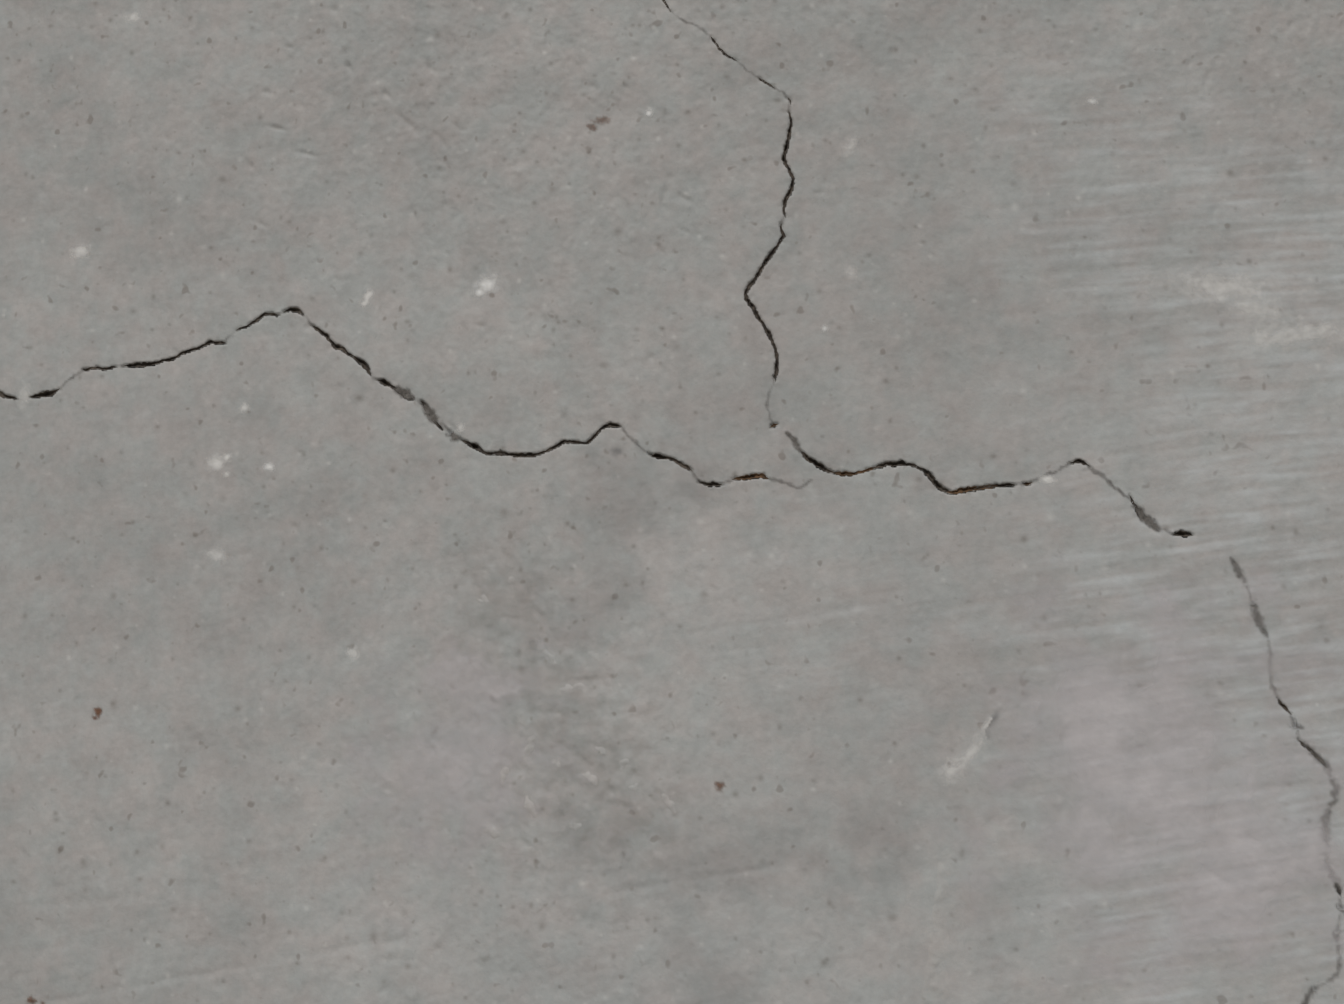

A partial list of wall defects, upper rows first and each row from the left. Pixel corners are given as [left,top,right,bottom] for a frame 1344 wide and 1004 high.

crack [711,37,794,379]
crack [0,307,622,458]
crack [650,453,769,487]
crack [771,423,1033,494]
crack [1070,459,1192,537]
crack [1232,560,1266,634]
crack [1279,699,1342,938]